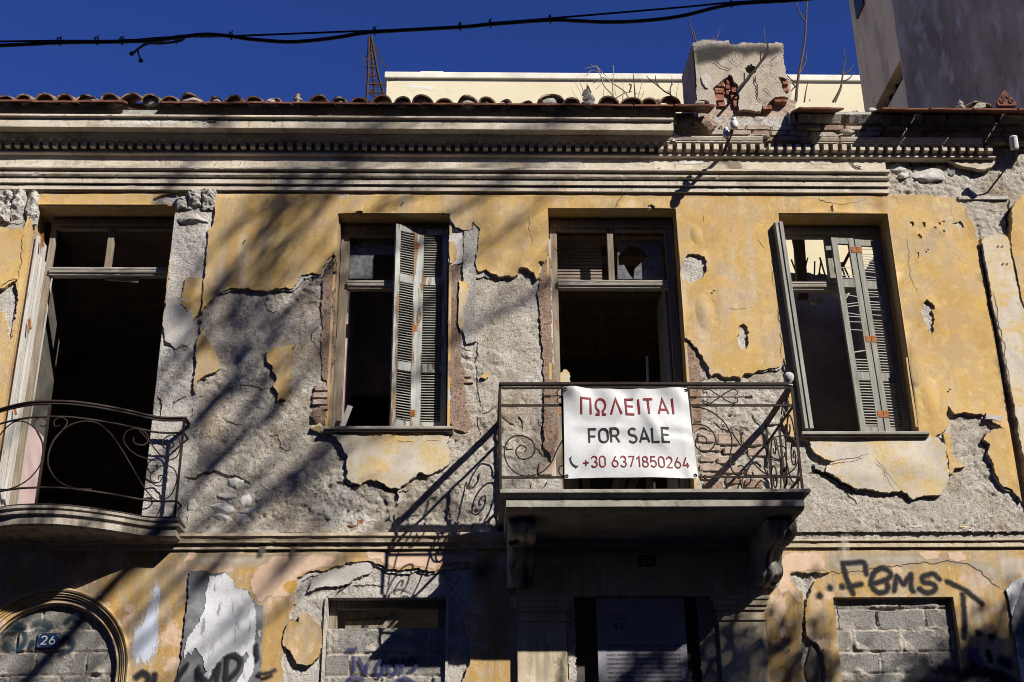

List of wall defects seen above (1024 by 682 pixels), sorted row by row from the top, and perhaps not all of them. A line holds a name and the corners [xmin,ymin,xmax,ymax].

spalling [701,73,923,147]
flaking render [885,126,1024,248]
flaking render [0,283,18,340]
flaking render [143,193,562,533]
flaking render [682,255,706,283]
flaking render [737,325,749,350]
flaking render [921,301,934,334]
crack [993,294,1021,436]
flaking render [687,342,1024,682]
flaking render [250,550,477,682]